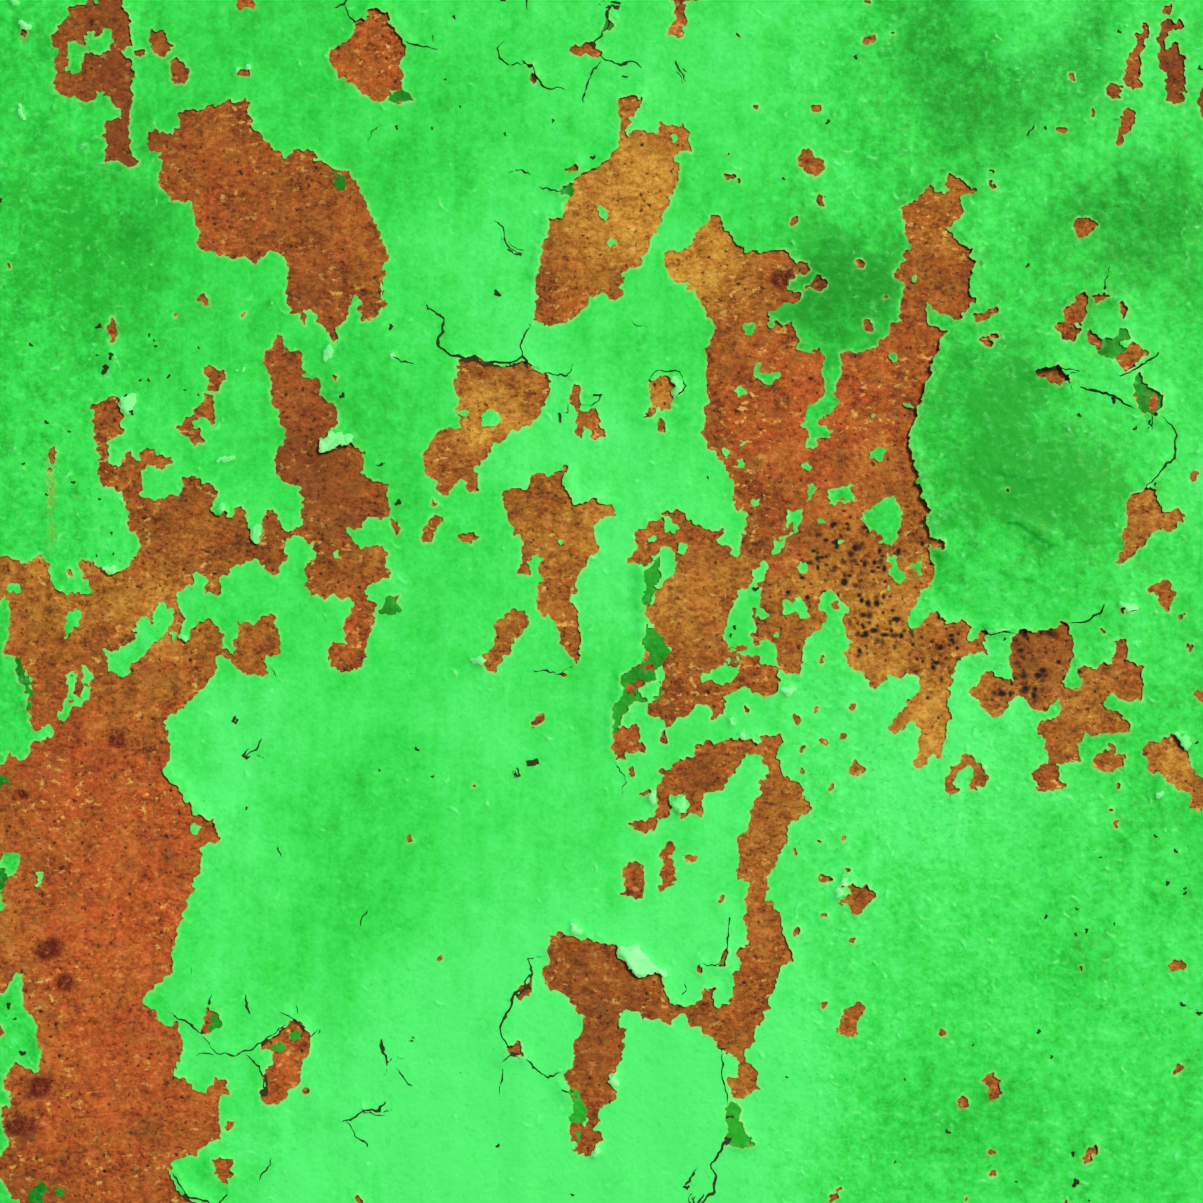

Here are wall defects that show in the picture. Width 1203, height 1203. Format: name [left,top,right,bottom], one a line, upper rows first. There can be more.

rust [51,0,190,167]
rust [329,8,413,104]
crack [496,0,641,102]
rust [147,98,389,362]
rust [534,95,692,326]
crack [426,304,602,423]
crack [1036,352,1178,490]
rust [517,169,1144,1158]
rust [0,335,402,1203]
crack [172,994,321,1097]
crack [499,958,573,1094]
crack [685,1048,734,1203]